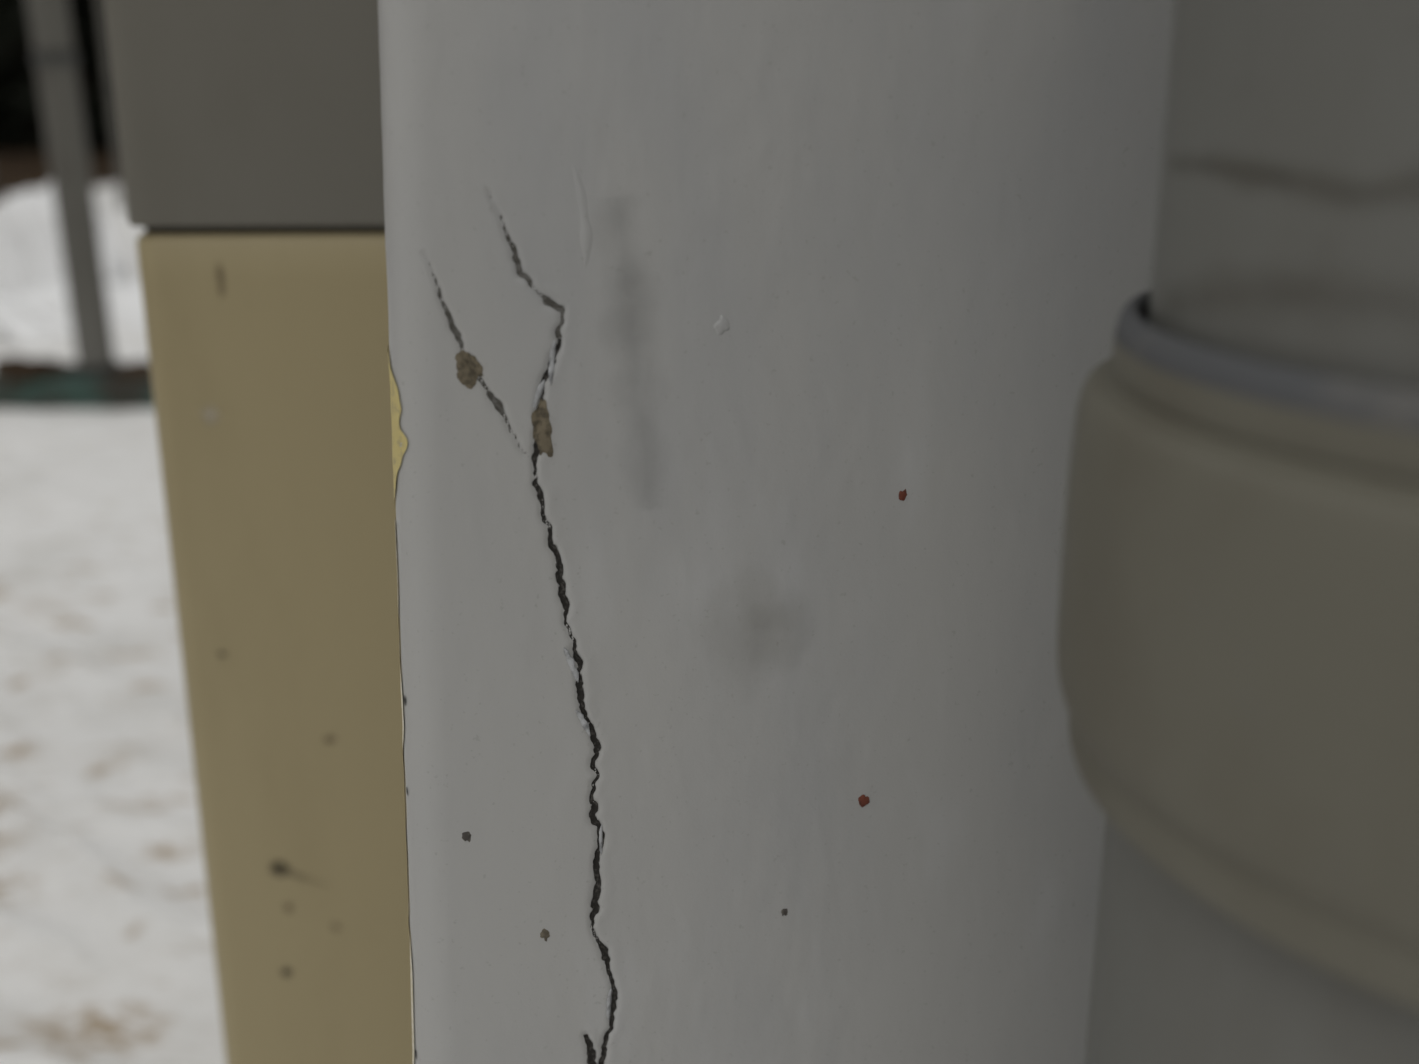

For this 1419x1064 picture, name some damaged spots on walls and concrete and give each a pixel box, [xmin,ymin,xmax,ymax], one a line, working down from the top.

crack [429,196,618,1064]